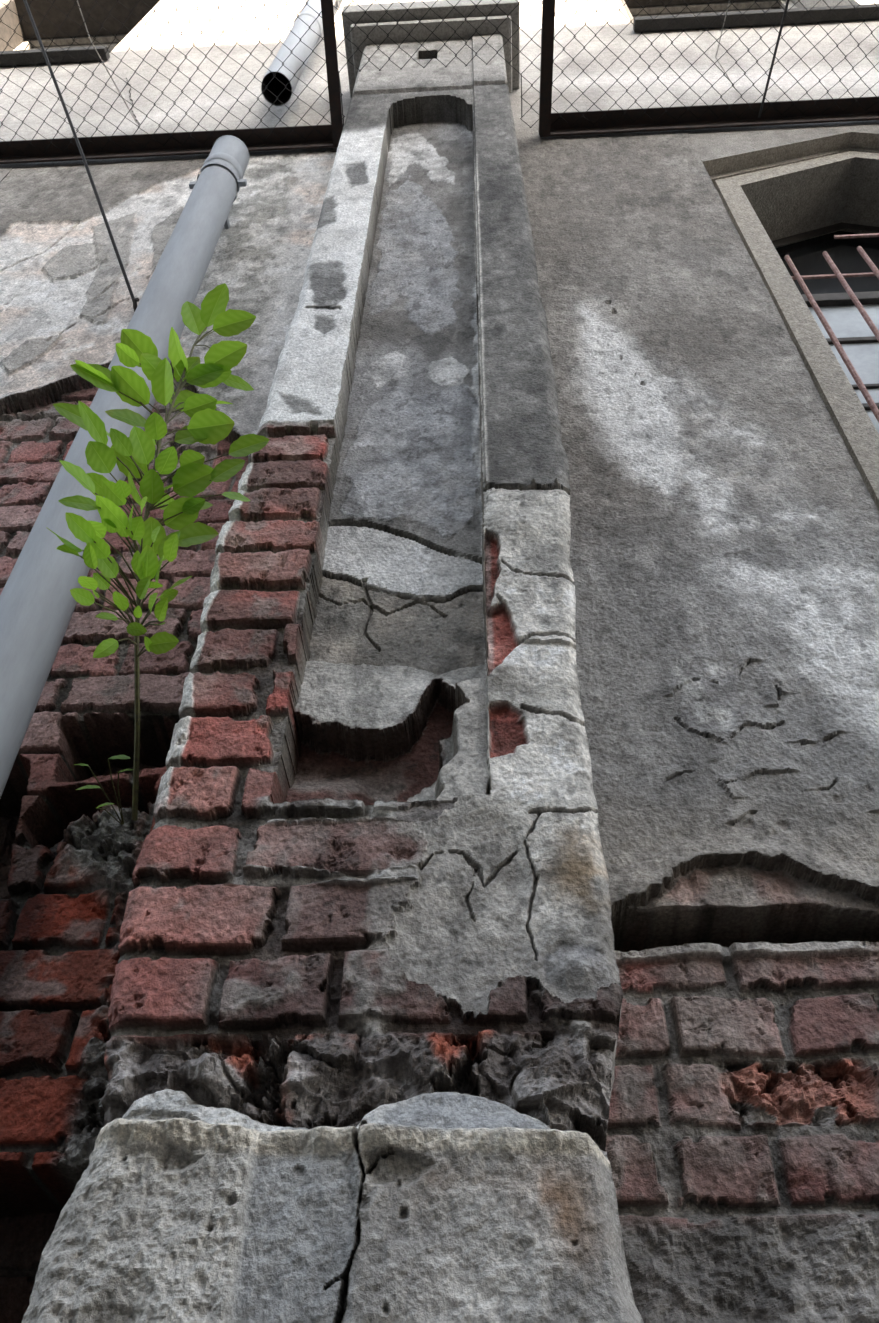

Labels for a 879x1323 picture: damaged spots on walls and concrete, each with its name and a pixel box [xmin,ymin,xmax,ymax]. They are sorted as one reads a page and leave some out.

crack [314,569,448,652]
flaking render [0,136,623,1323]
crack [662,657,842,826]
crack [419,805,598,961]
flaking render [385,635,879,1323]
crack [323,1119,370,1323]